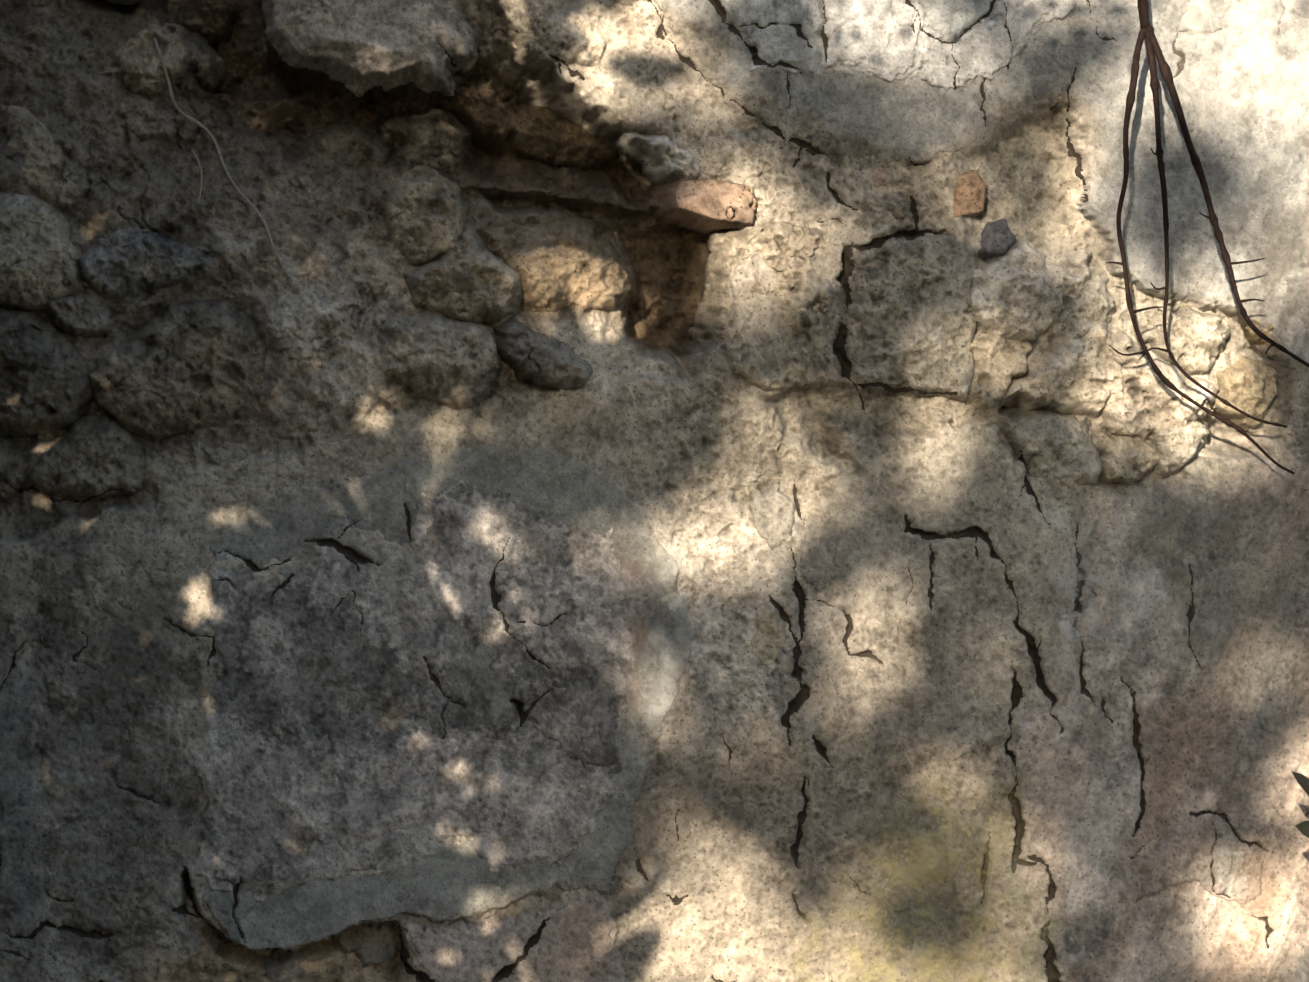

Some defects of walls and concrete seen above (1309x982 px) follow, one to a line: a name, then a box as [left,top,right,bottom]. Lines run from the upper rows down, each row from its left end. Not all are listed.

crack [905,0,1013,139]
crack [1086,0,1117,41]
crack [647,0,958,414]
flaking render [150,436,318,500]
crack [213,520,380,637]
crack [403,503,413,548]
crack [423,656,466,739]
crack [489,537,567,730]
crack [769,484,884,922]
crack [904,450,1159,982]
crack [1189,810,1273,948]